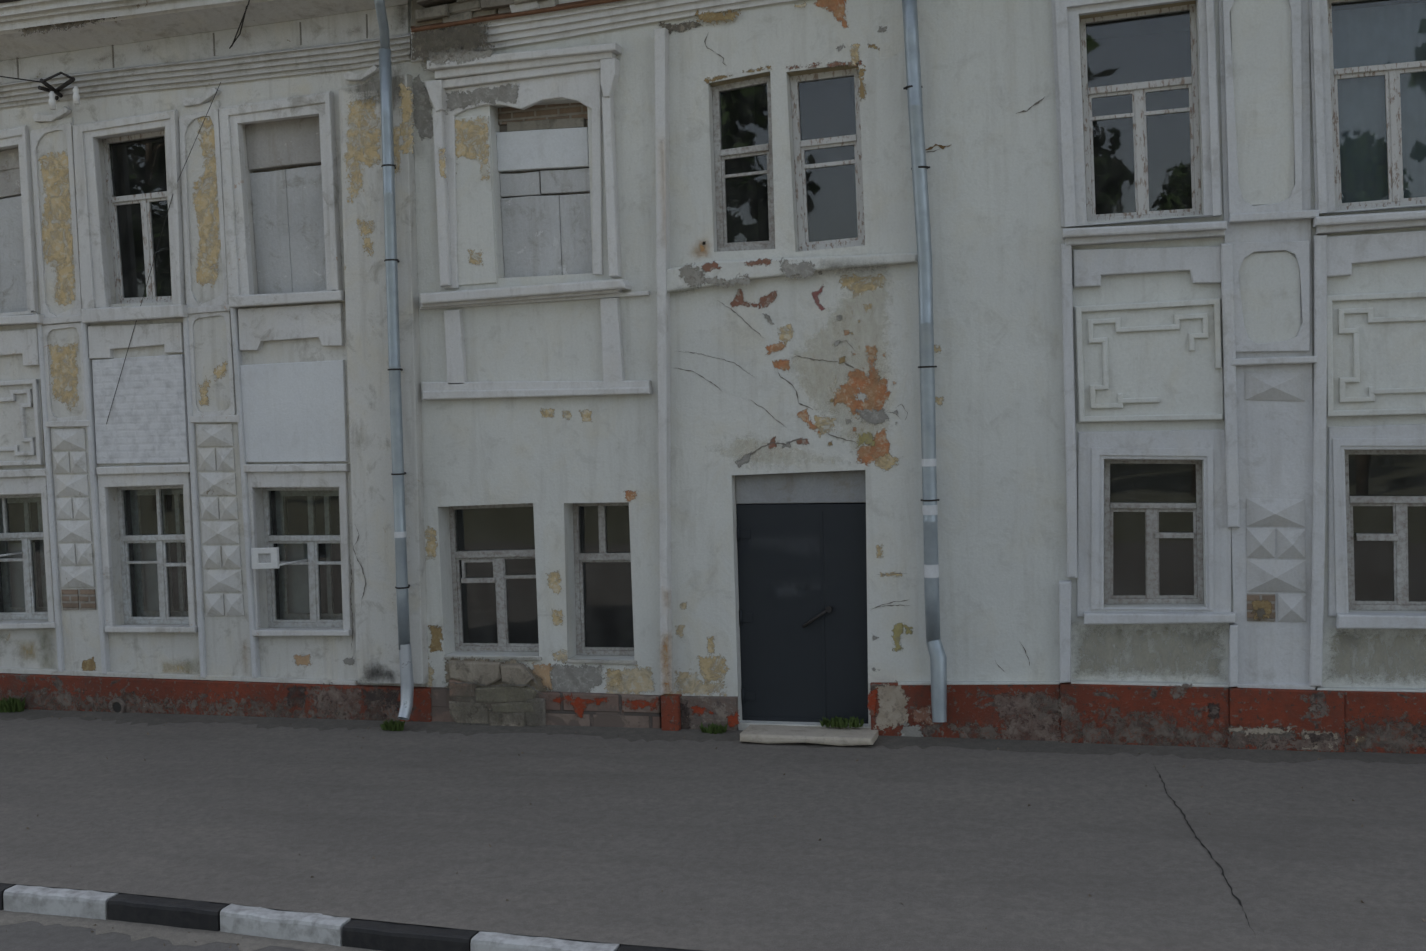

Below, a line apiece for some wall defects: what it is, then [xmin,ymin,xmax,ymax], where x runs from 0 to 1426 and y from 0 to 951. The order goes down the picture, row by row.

peeling [343,17,519,203]
spalling [659,9,741,34]
peeling [789,0,887,100]
peeling [38,151,75,306]
peeling [192,117,221,288]
crack [677,340,859,468]
peeling [679,258,899,471]
flaking render [531,649,661,718]
peeling [672,636,740,729]
peeling [867,668,1061,741]
peeling [1196,703,1426,752]
crack [1152,763,1250,927]